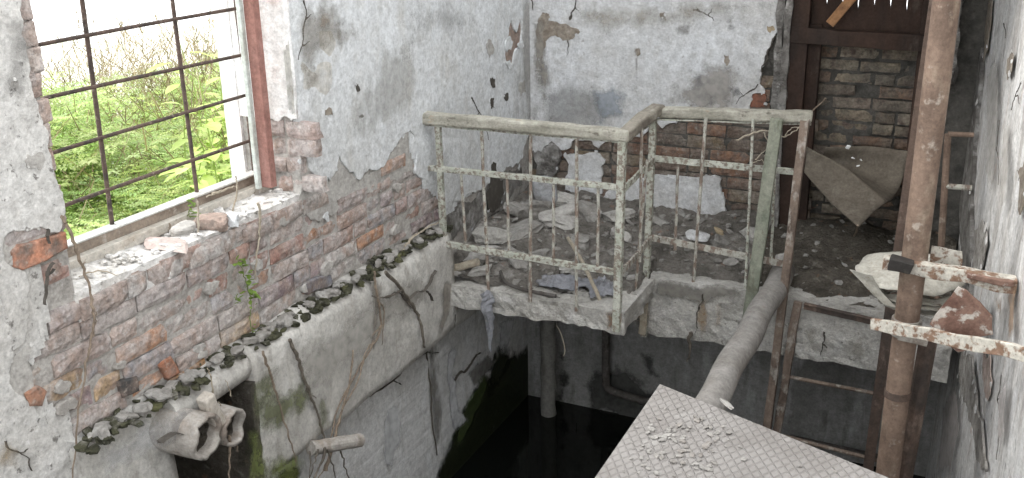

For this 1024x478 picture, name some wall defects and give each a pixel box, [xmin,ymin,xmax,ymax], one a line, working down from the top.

crack [298,0,311,60]
flaking render [486,22,524,69]
flaking render [535,11,580,48]
flaking render [11,0,61,190]
flaking render [748,76,773,109]
flaking render [3,107,769,437]
spalling [720,351,887,466]